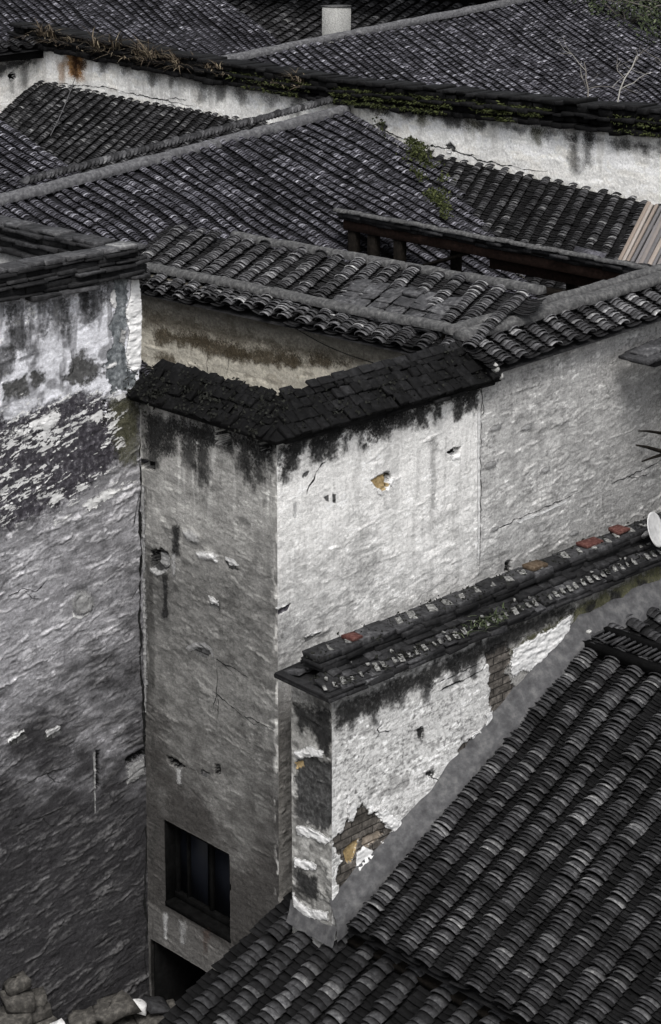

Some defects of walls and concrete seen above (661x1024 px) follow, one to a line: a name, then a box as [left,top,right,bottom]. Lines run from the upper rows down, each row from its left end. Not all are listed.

rust [65,55,87,81]
leakage [360,100,661,173]
leakage [111,389,481,491]
spalling [371,473,395,496]
crack [477,389,577,577]
crack [131,438,146,766]
crack [212,659,272,729]
leakage [293,566,661,756]
spalling [293,745,402,888]
crack [135,815,149,992]
leakage [295,869,319,900]
spalling [292,892,329,921]